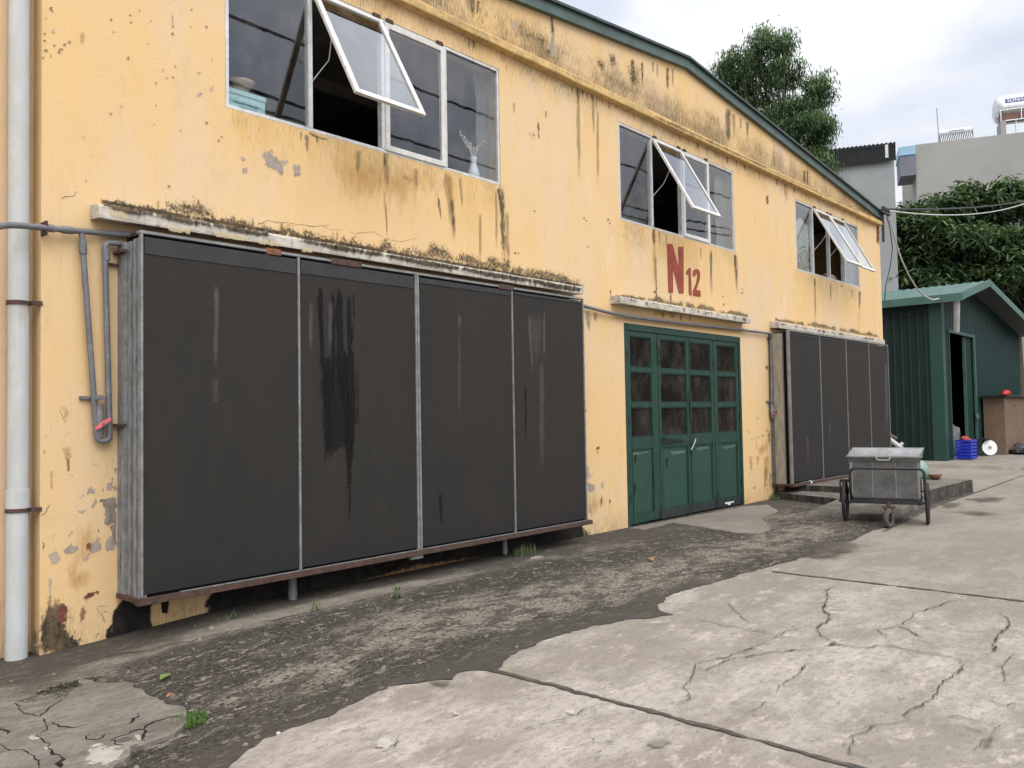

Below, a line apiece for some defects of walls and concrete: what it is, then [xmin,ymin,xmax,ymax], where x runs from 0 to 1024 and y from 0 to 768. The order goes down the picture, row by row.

damp [628,60,673,91]
flaking render [261,149,301,176]
damp [657,111,817,192]
damp [101,188,582,291]
peeling [49,468,117,564]
damp [32,602,81,657]
crack [676,585,1020,762]
crack [0,699,180,768]